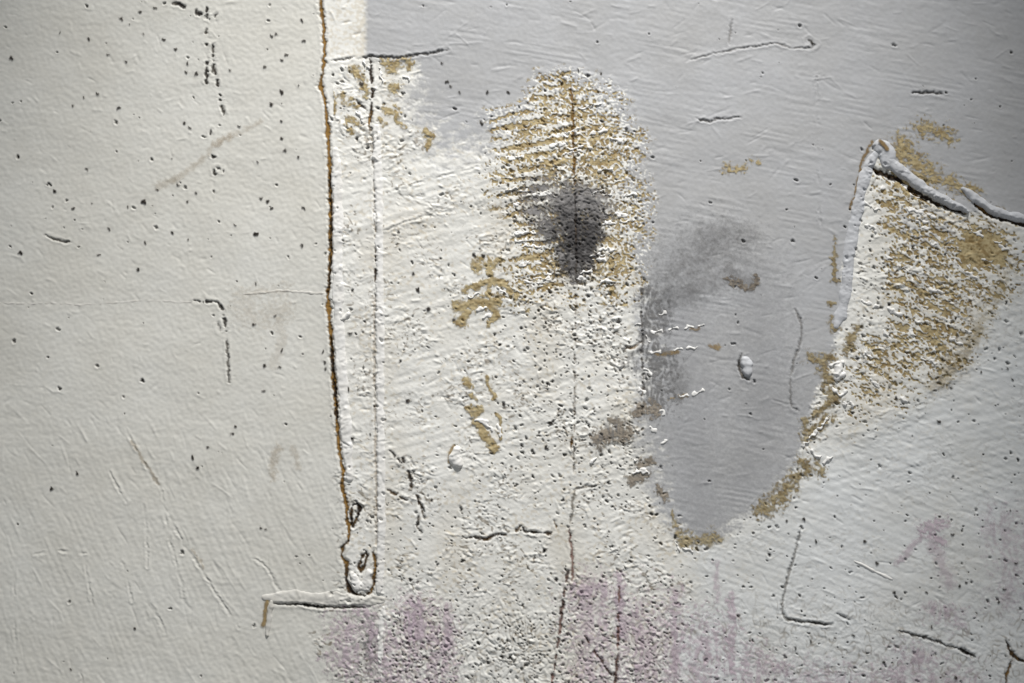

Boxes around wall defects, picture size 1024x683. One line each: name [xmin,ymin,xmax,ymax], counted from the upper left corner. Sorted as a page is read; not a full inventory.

crack [199,300,230,383]
crack [276,0,442,609]
peeling [452,69,657,327]
peeling [751,114,1024,522]
crack [469,485,621,683]
crack [902,631,975,657]